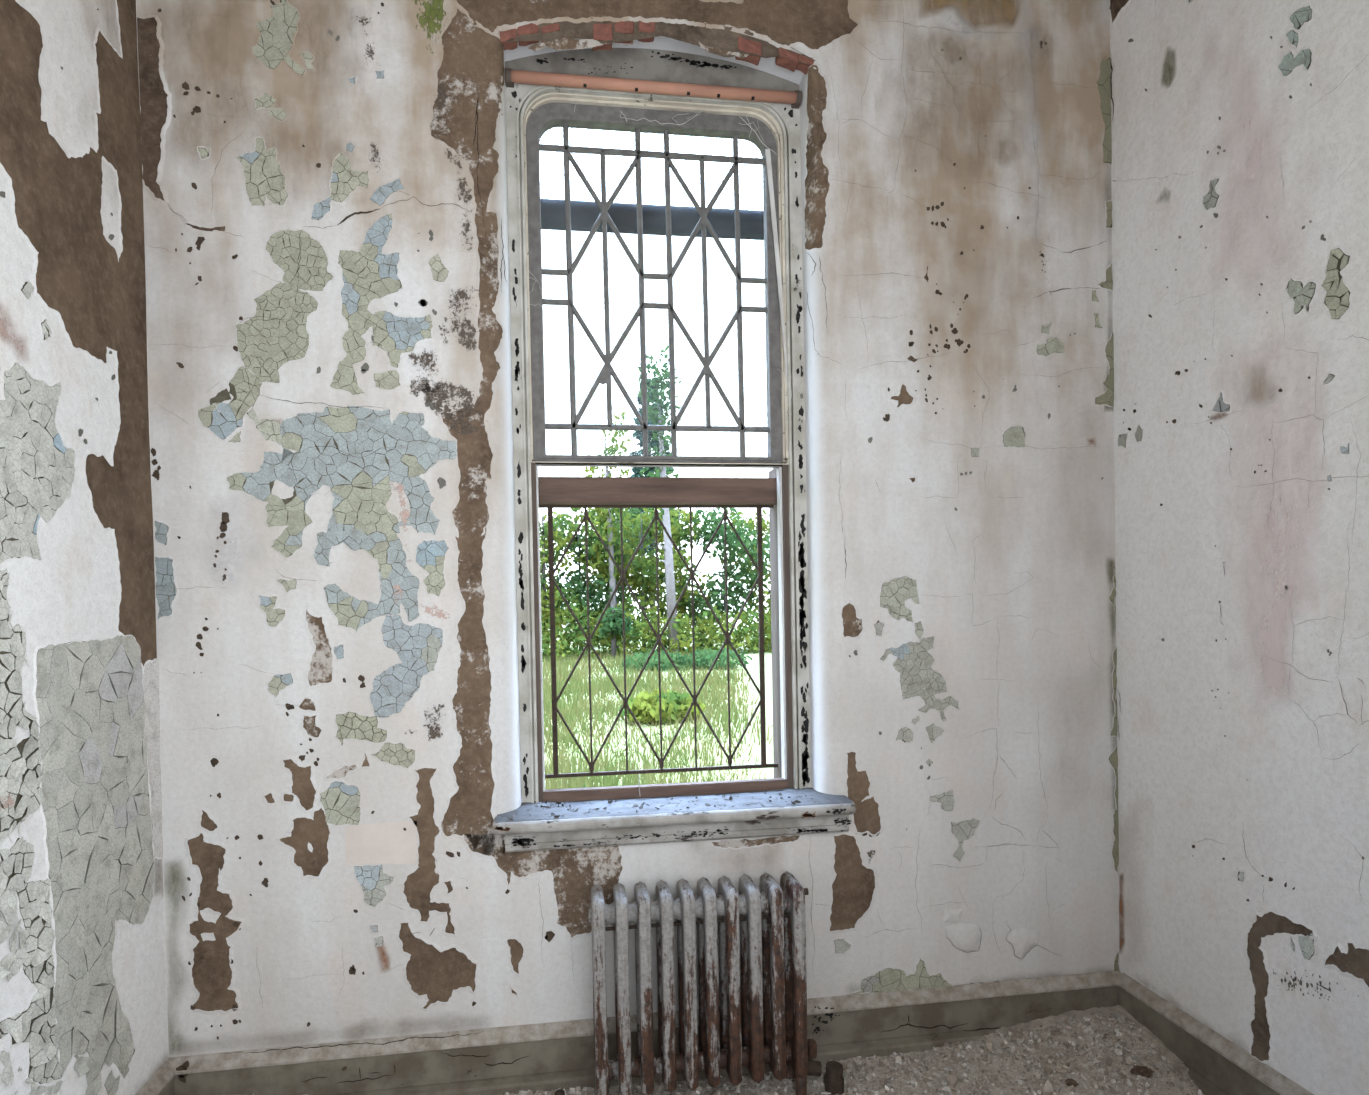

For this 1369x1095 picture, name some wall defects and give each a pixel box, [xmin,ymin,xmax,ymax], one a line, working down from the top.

water stain [924,0,1018,28]
peeling [1270,2,1315,99]
peeling [1285,220,1354,322]
flaking render [0,0,232,1095]
peeling [838,574,981,863]
flaking render [182,792,269,1039]
peeling [812,1006,840,1034]
peeling [850,957,999,995]
flaking render [1222,858,1369,1065]